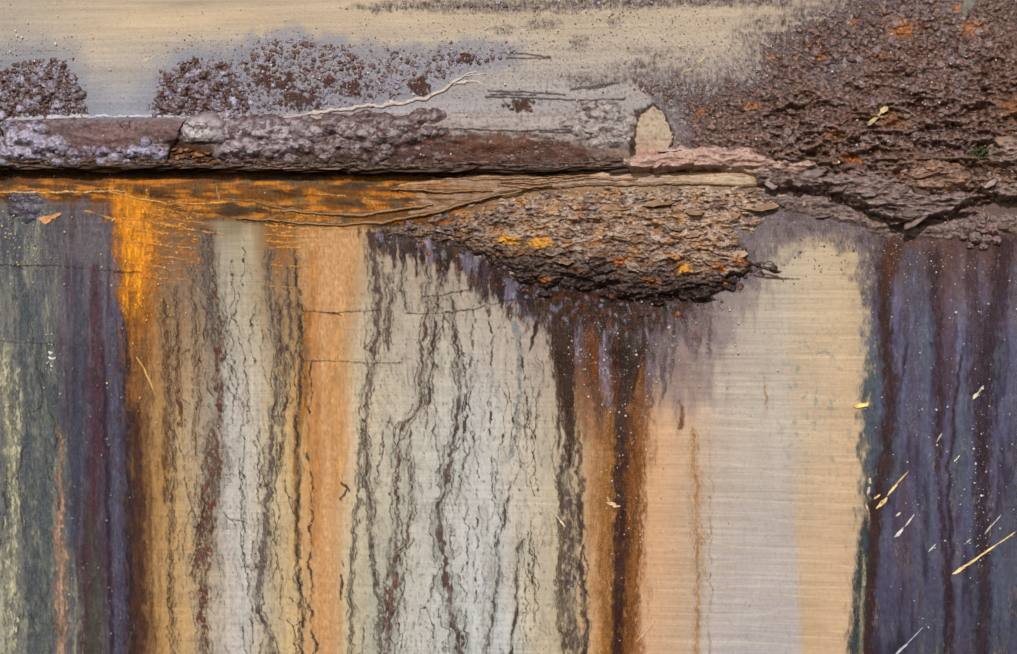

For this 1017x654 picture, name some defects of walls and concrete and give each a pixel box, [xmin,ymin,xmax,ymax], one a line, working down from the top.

corrosion [254,64,369,112]
corrosion [346,0,1017,229]
damp [0,197,232,654]
crack [164,238,435,654]
corrosion [0,129,806,654]
crack [407,289,559,534]
crack [521,525,539,641]
damp [733,209,1017,654]